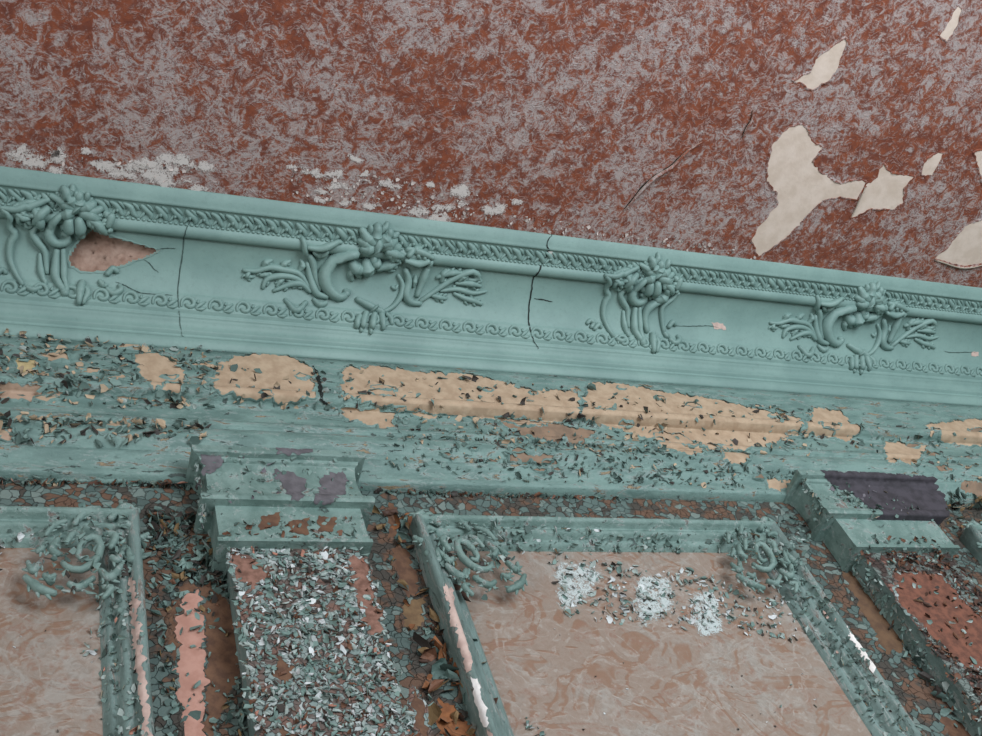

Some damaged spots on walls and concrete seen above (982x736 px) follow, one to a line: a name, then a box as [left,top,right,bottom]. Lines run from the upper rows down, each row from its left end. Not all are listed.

peeling [938,3,964,43]
peeling [791,36,849,91]
peeling [728,122,945,260]
peeling [972,149,982,187]
spalling [67,228,161,273]
peeling [934,218,982,269]
crack [528,235,552,349]
peeling [0,328,982,736]